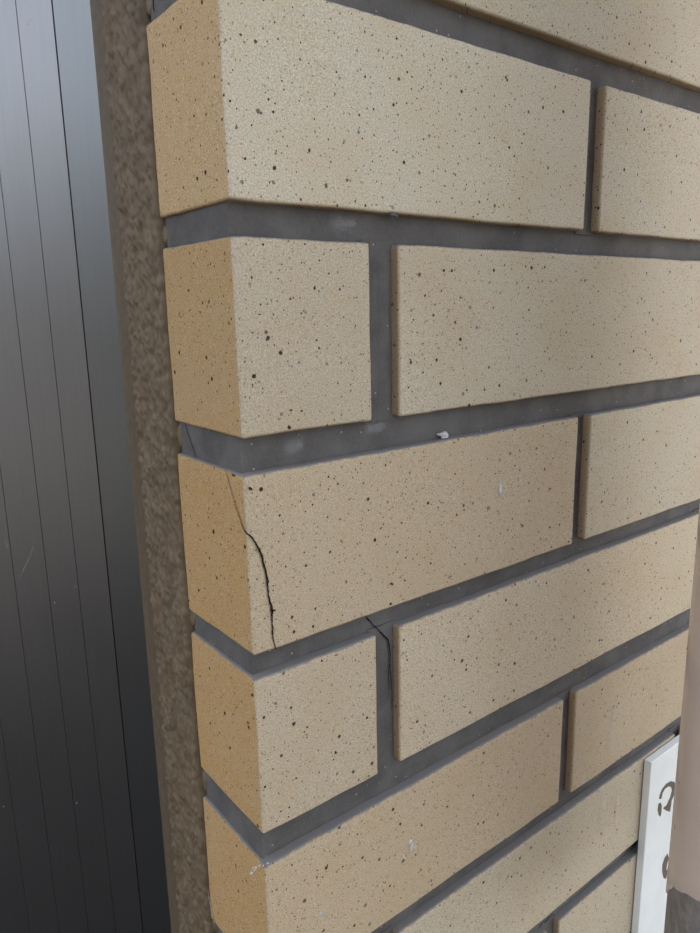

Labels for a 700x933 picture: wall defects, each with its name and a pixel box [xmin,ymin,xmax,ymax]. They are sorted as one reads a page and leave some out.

crack [225,470,276,650]
crack [366,616,393,700]